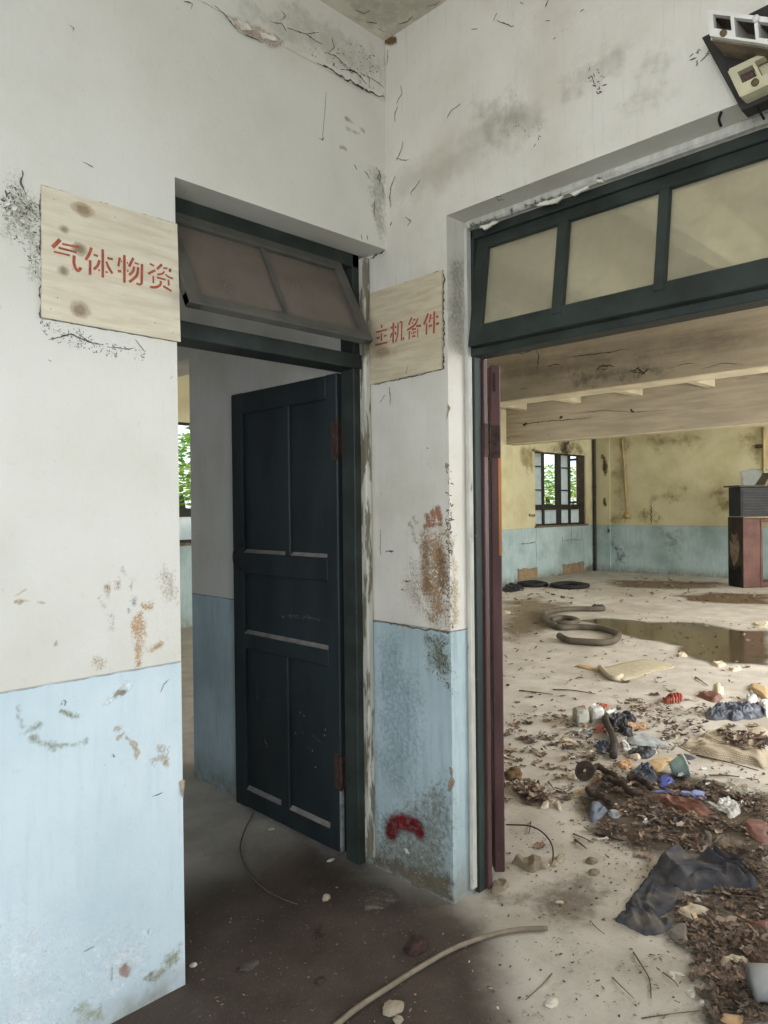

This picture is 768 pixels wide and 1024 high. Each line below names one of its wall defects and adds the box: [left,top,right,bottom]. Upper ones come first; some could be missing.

crack [271,21,385,98]
leakage [0,171,41,274]
peeling [469,217,498,230]
peeling [510,177,604,215]
crack [40,321,146,361]
crack [549,348,650,375]
corrosion [420,530,458,627]
corrosion [132,604,162,666]
leakage [424,635,449,688]